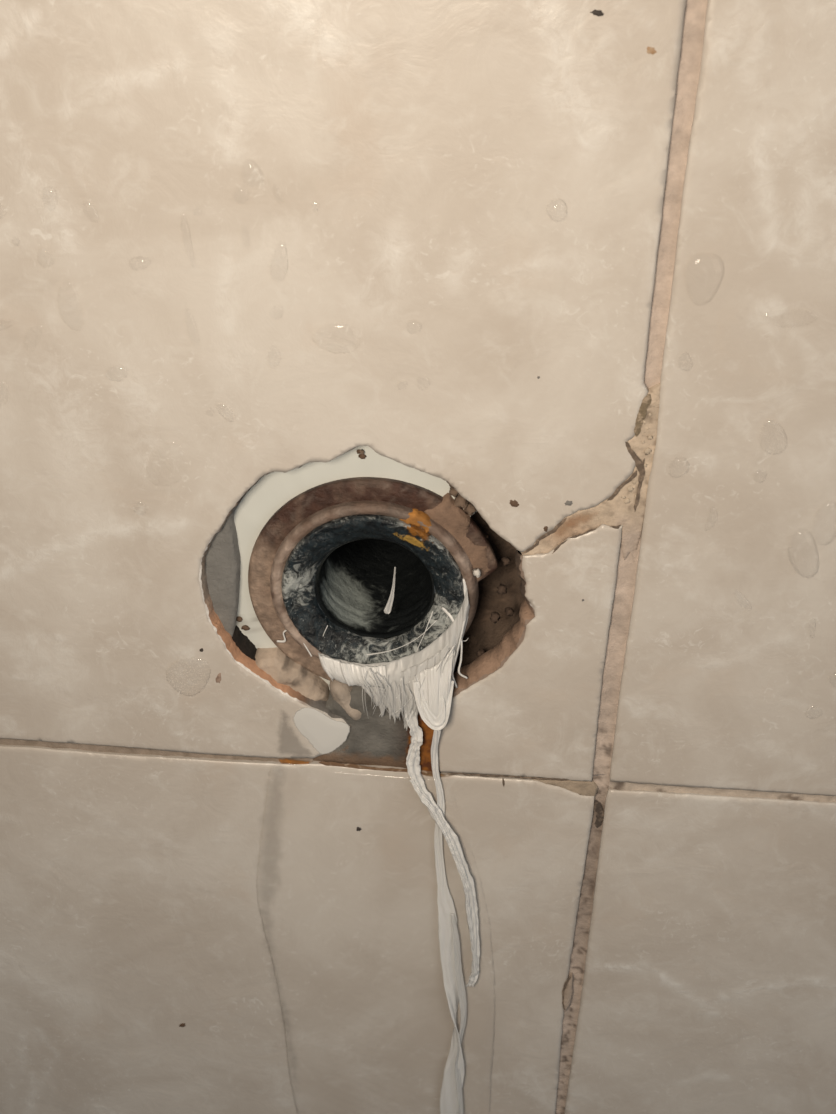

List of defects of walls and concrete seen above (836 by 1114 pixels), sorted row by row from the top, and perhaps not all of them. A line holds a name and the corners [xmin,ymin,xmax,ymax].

spalling [199,471,409,768]
rust [400,508,432,533]
spalling [424,480,535,698]
crack [521,383,660,561]